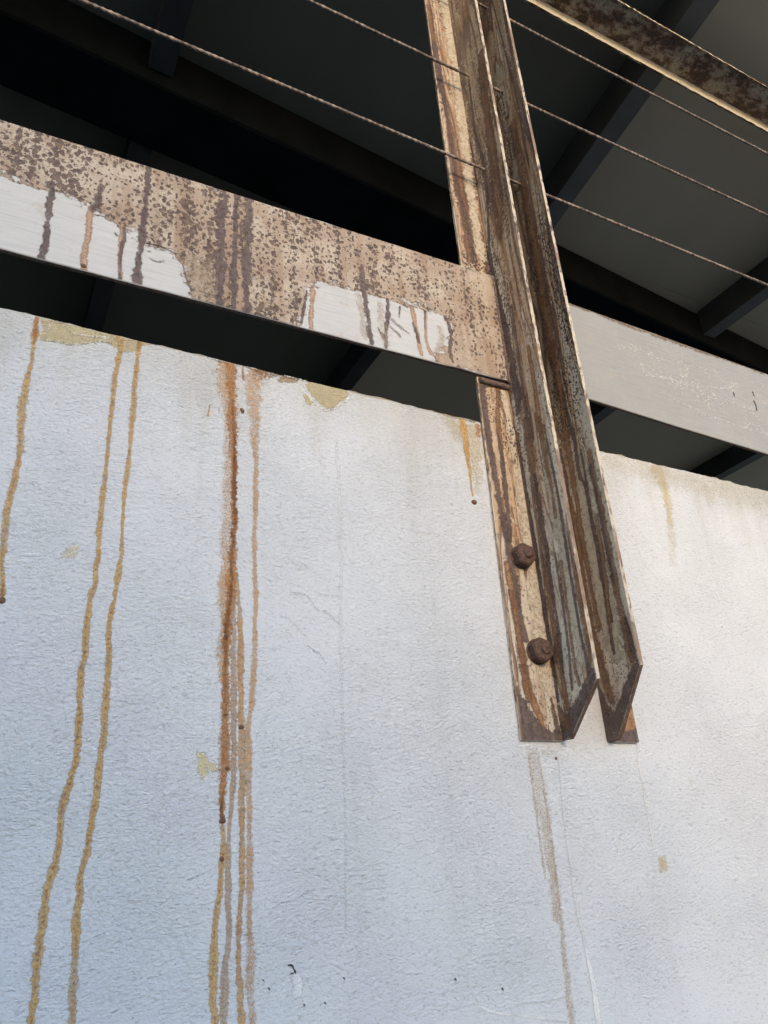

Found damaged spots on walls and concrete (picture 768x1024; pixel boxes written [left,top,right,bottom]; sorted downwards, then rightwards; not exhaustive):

rust [26,336,124,1024]
rust [68,341,142,1024]
rust [207,357,299,1024]
rust [0,0,639,742]